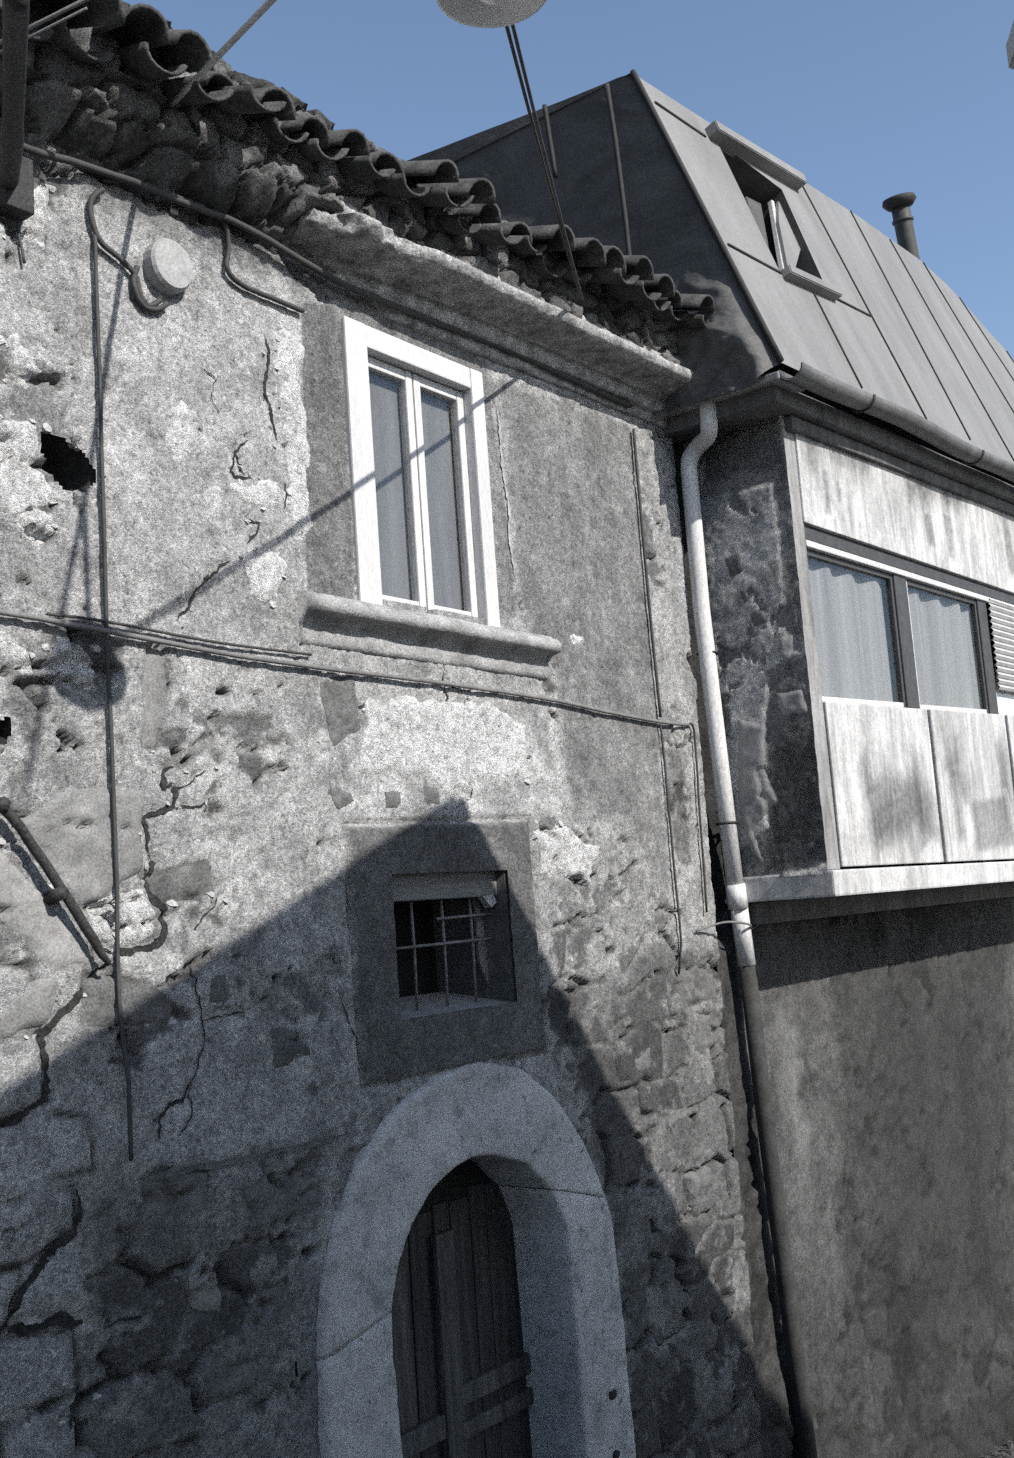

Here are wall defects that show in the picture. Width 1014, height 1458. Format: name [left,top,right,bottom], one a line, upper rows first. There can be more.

flaking render [0,183,56,247]
flaking render [0,333,42,389]
flaking render [0,415,107,550]
crack [176,334,287,629]
crack [0,766,245,1137]
crack [0,1188,142,1338]